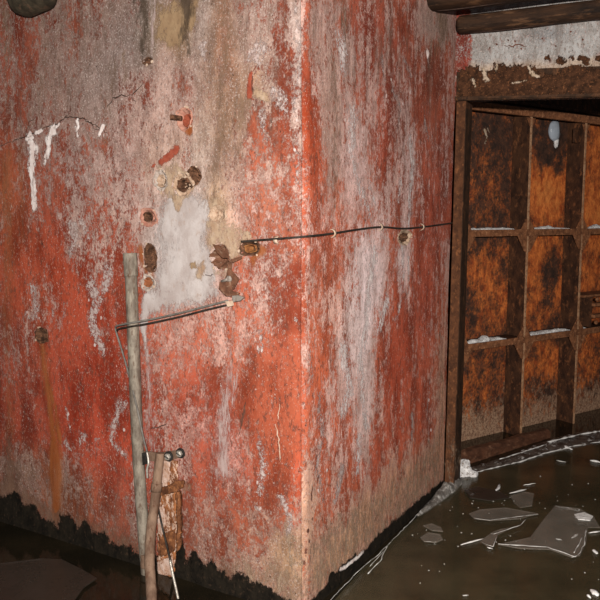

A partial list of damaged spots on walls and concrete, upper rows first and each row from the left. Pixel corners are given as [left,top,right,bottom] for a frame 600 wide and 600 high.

water stain [25,122,61,211]
crack [2,110,107,146]
spalling [170,106,193,132]
peeling [140,166,231,357]
water stain [0,439,140,566]
water stain [174,433,444,600]